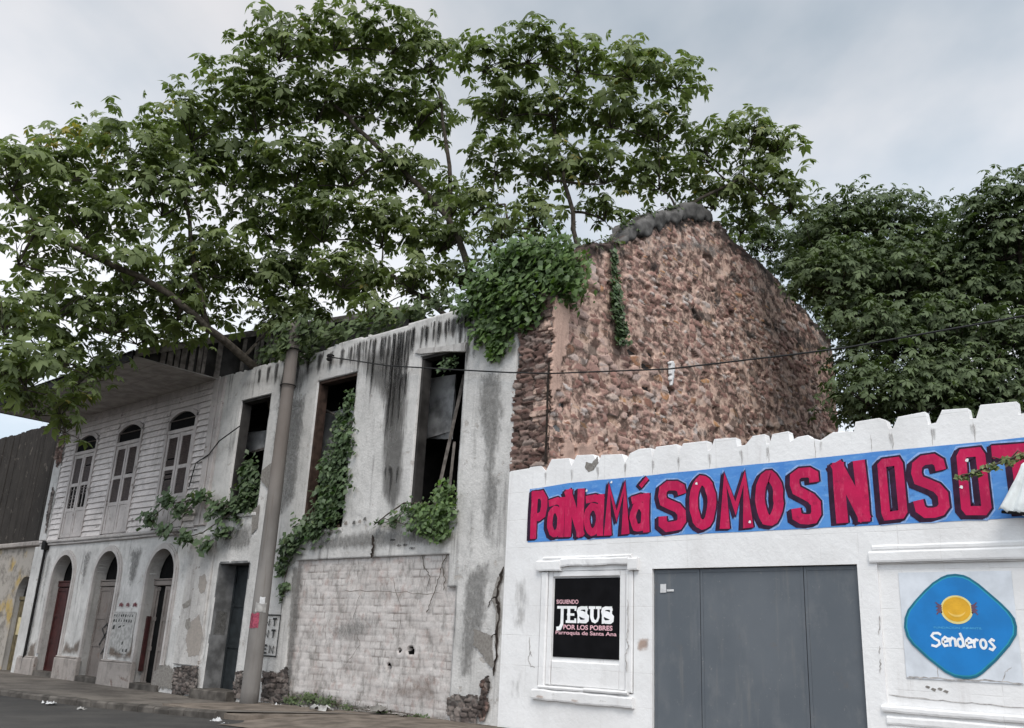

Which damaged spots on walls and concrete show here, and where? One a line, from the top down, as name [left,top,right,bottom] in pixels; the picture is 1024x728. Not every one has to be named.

water stain [258,316,476,511]
water stain [480,376,500,529]
flaking render [151,574,207,695]
crack [346,554,448,662]
flaking render [446,576,501,724]
crack [488,567,504,676]